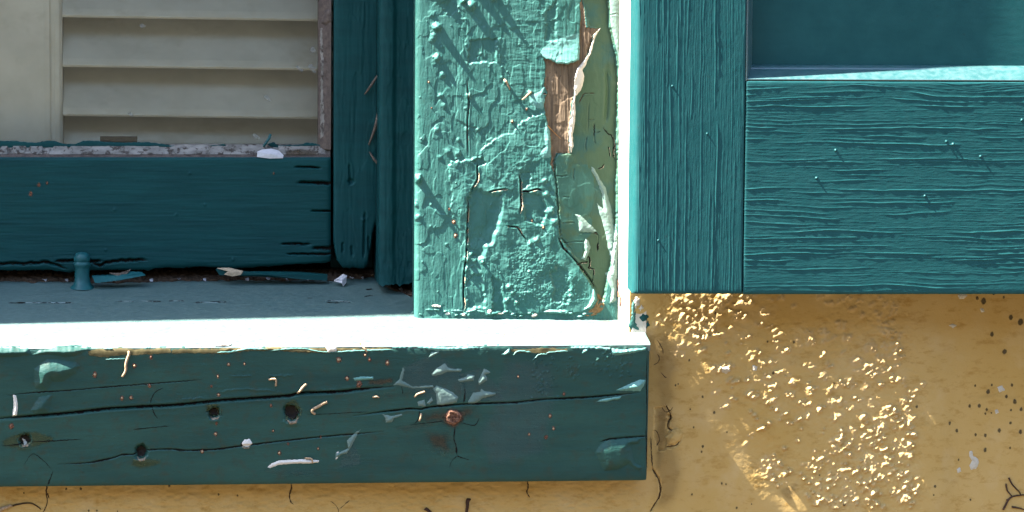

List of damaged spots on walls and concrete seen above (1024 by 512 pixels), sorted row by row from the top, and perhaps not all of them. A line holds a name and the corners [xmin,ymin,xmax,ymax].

spalling [257,149,284,159]
peeling [529,0,620,318]
crack [463,165,574,324]
spalling [410,305,537,317]
peeling [88,343,496,407]
peeling [501,346,611,360]
crack [0,340,679,512]